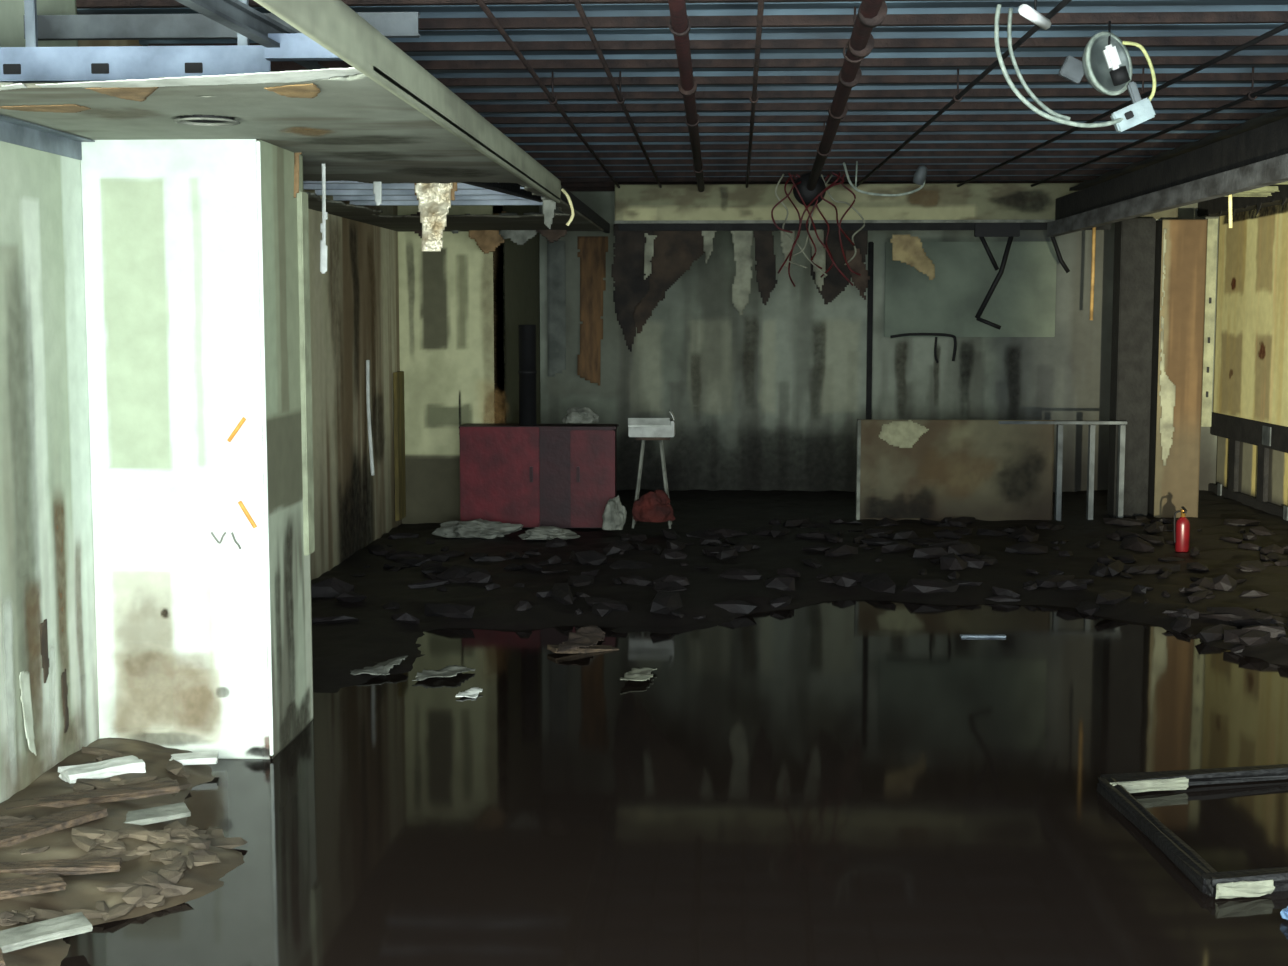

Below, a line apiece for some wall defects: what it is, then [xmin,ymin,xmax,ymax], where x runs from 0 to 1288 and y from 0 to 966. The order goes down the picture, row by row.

leakage [1224,203,1288,224]
leakage [617,431,850,492]
leakage [4,502,82,742]